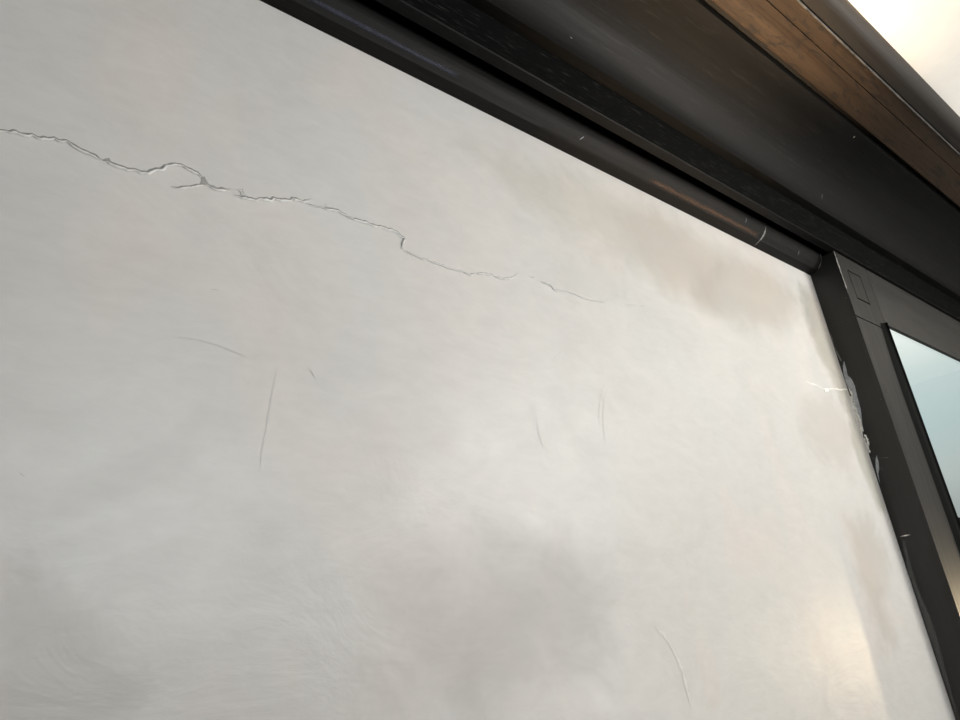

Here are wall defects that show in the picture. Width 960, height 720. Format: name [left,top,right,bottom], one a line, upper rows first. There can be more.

crack [0,129,646,307]
peeling [830,333,887,482]